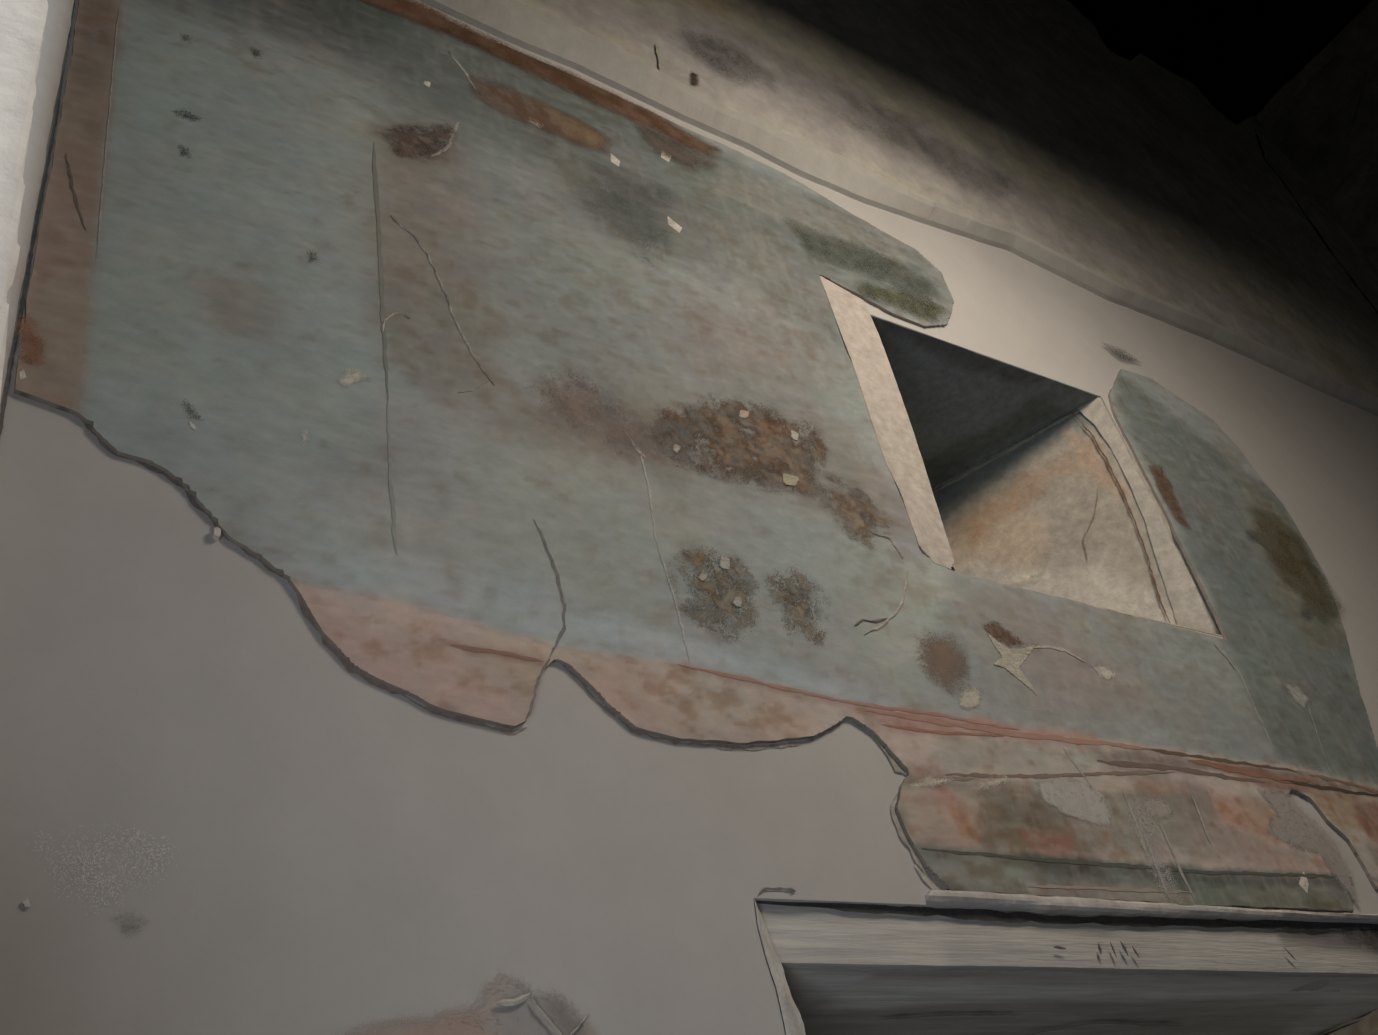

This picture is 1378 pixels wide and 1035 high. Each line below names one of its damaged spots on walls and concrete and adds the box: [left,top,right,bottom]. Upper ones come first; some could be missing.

spalling [378,122,459,160]
crack [391,215,495,393]
spalling [644,388,897,551]
spalling [660,544,832,649]
spalling [983,620,1028,648]
crack [82,410,1378,931]
peeling [1036,777,1113,827]
spalling [1299,872,1309,893]
crack [496,993,589,1035]